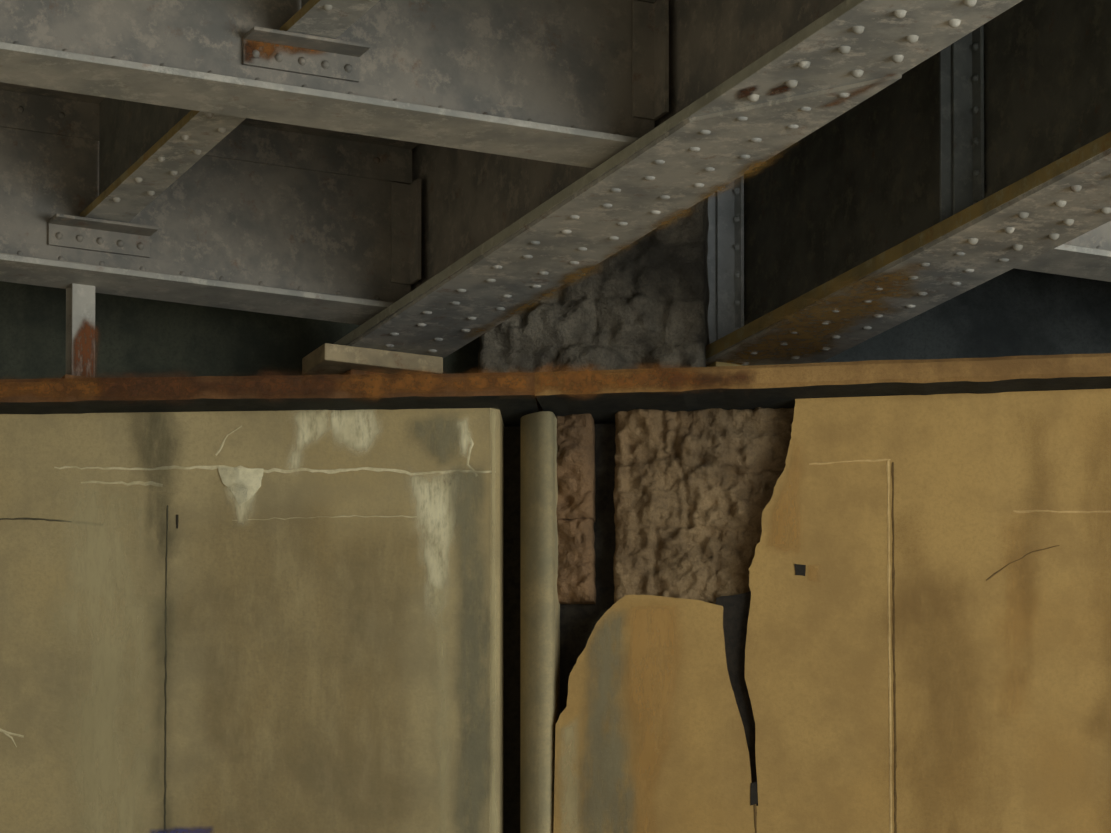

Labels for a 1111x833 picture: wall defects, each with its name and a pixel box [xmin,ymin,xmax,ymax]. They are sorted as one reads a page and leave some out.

corrosion [245,40,319,61]
corrosion [73,321,97,378]
corrosion [534,366,751,396]
spalling [556,414,596,604]
spalling [613,407,794,604]